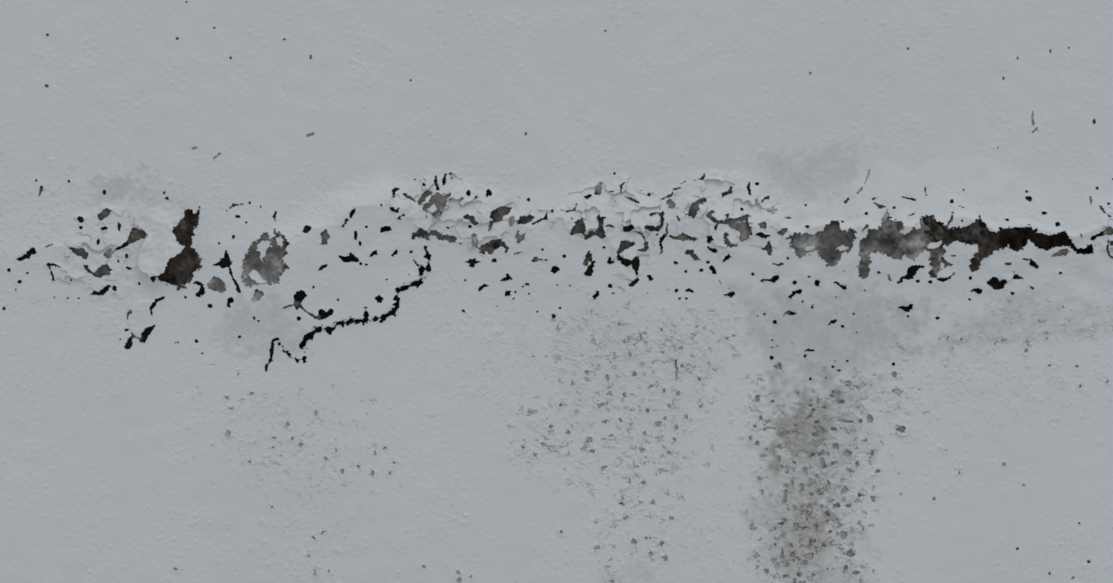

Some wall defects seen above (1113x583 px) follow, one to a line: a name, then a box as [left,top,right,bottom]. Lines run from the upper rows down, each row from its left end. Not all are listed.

peeling [43,199,203,354]
spalling [207,276,226,293]
crack [271,211,279,242]
crack [265,277,426,372]
peeling [241,164,950,378]
peeling [1098,195,1113,265]